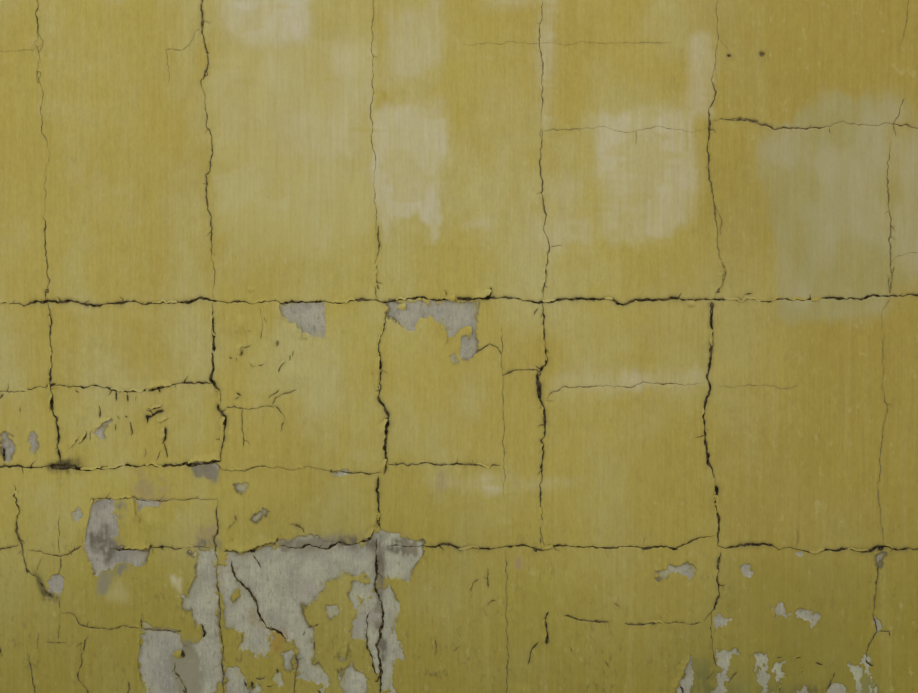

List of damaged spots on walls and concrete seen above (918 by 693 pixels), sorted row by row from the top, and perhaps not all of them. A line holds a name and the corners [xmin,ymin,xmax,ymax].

crack [34,1,49,161]
crack [369,7,377,172]
crack [463,2,666,111]
crack [166,0,215,285]
crack [538,128,583,225]
peeling [273,300,326,341]
peeling [386,300,480,364]
peeling [0,432,15,463]
peeling [132,622,181,693]
peeling [182,542,405,693]
peeling [389,540,426,582]
peeling [654,562,696,582]